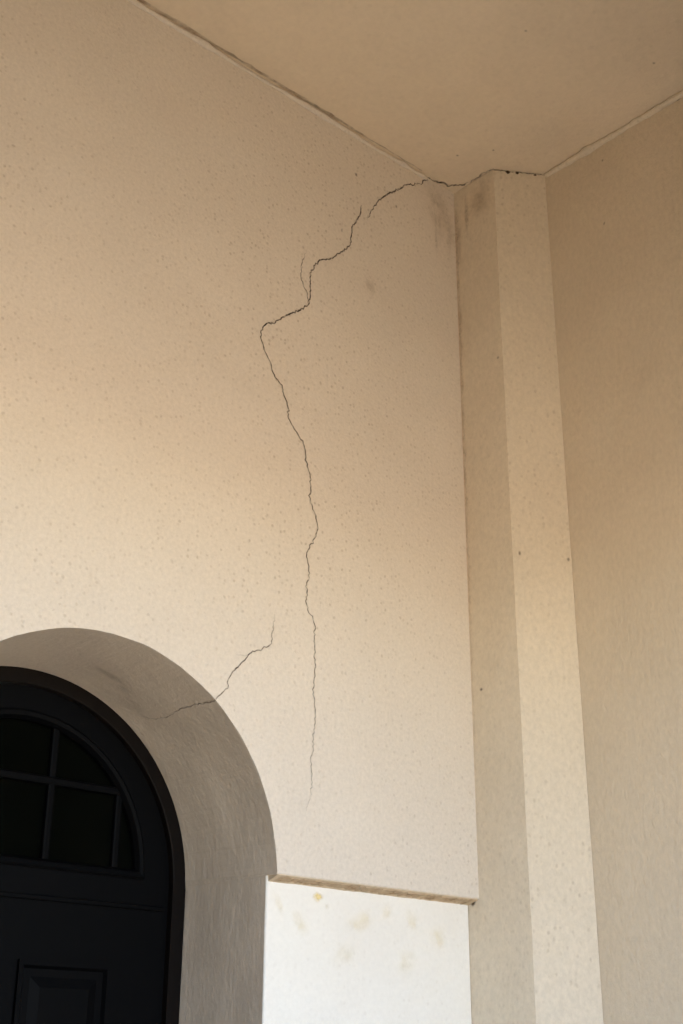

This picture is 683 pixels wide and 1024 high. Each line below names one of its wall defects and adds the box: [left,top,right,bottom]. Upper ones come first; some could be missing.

crack [179,640,272,710]
crack [260,170,542,772]